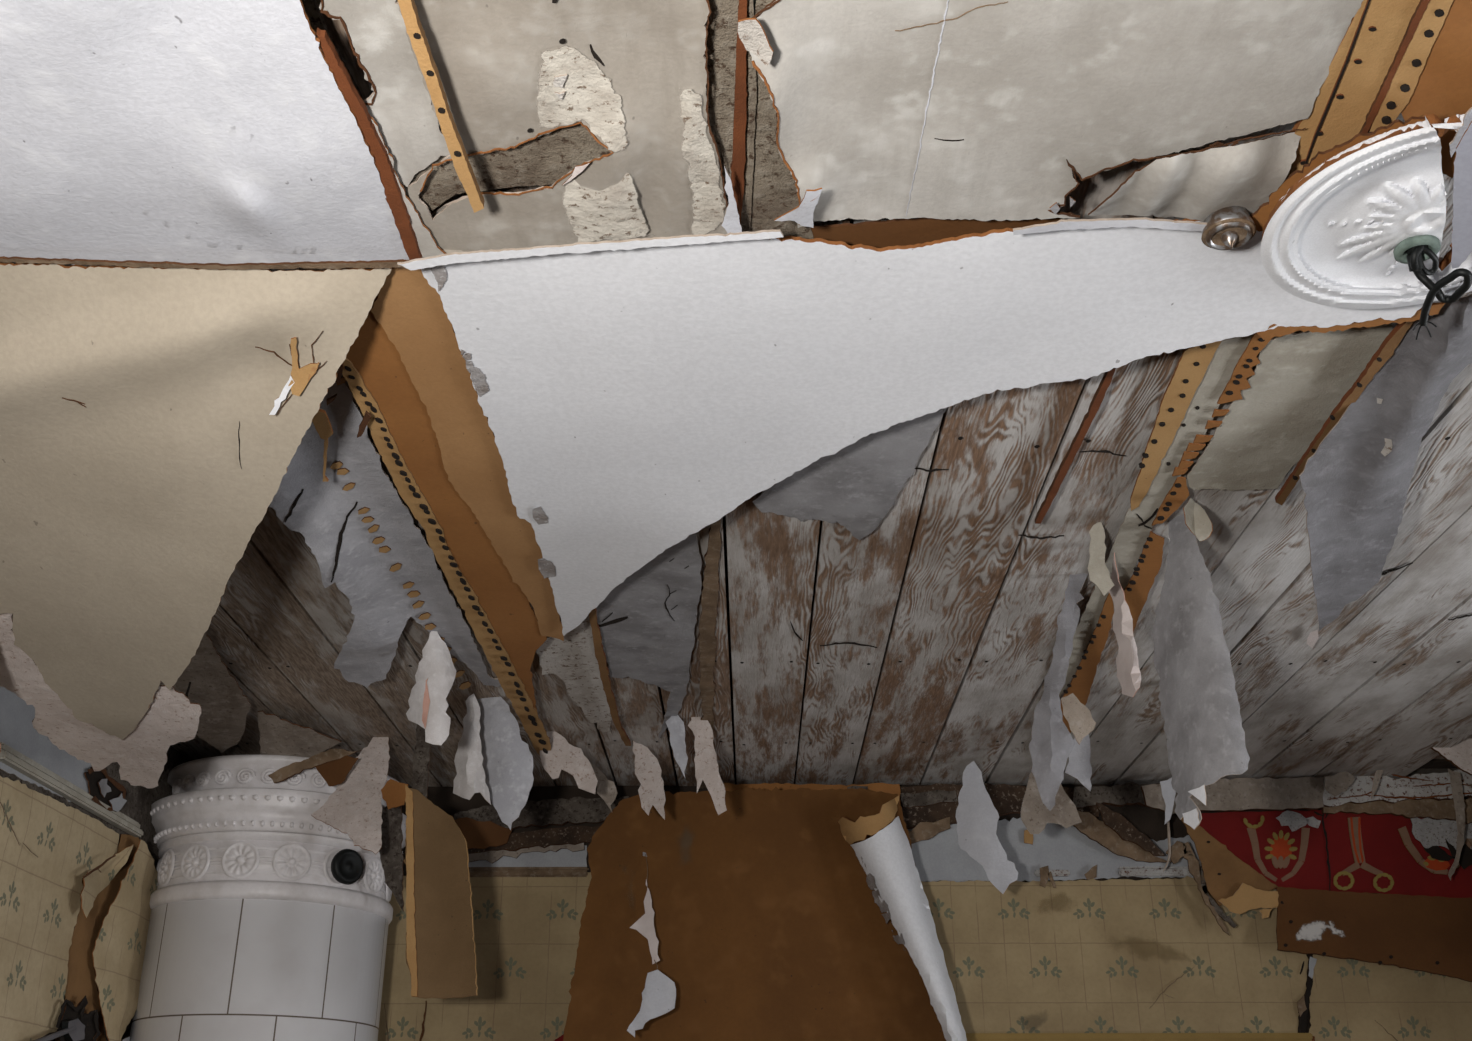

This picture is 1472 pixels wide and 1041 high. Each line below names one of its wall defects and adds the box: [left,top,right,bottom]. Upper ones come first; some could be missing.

peeling [537,46,628,152]
crack [895,0,1008,215]
peeling [679,89,725,235]
peeling [563,172,649,242]
peeling [431,265,447,292]
peeling [461,350,489,396]
peeling [1381,438,1392,456]
peeling [532,507,548,525]
peeling [538,558,556,578]
peeling [1276,811,1321,832]
peeling [1410,817,1472,869]
peeling [861,858,905,945]